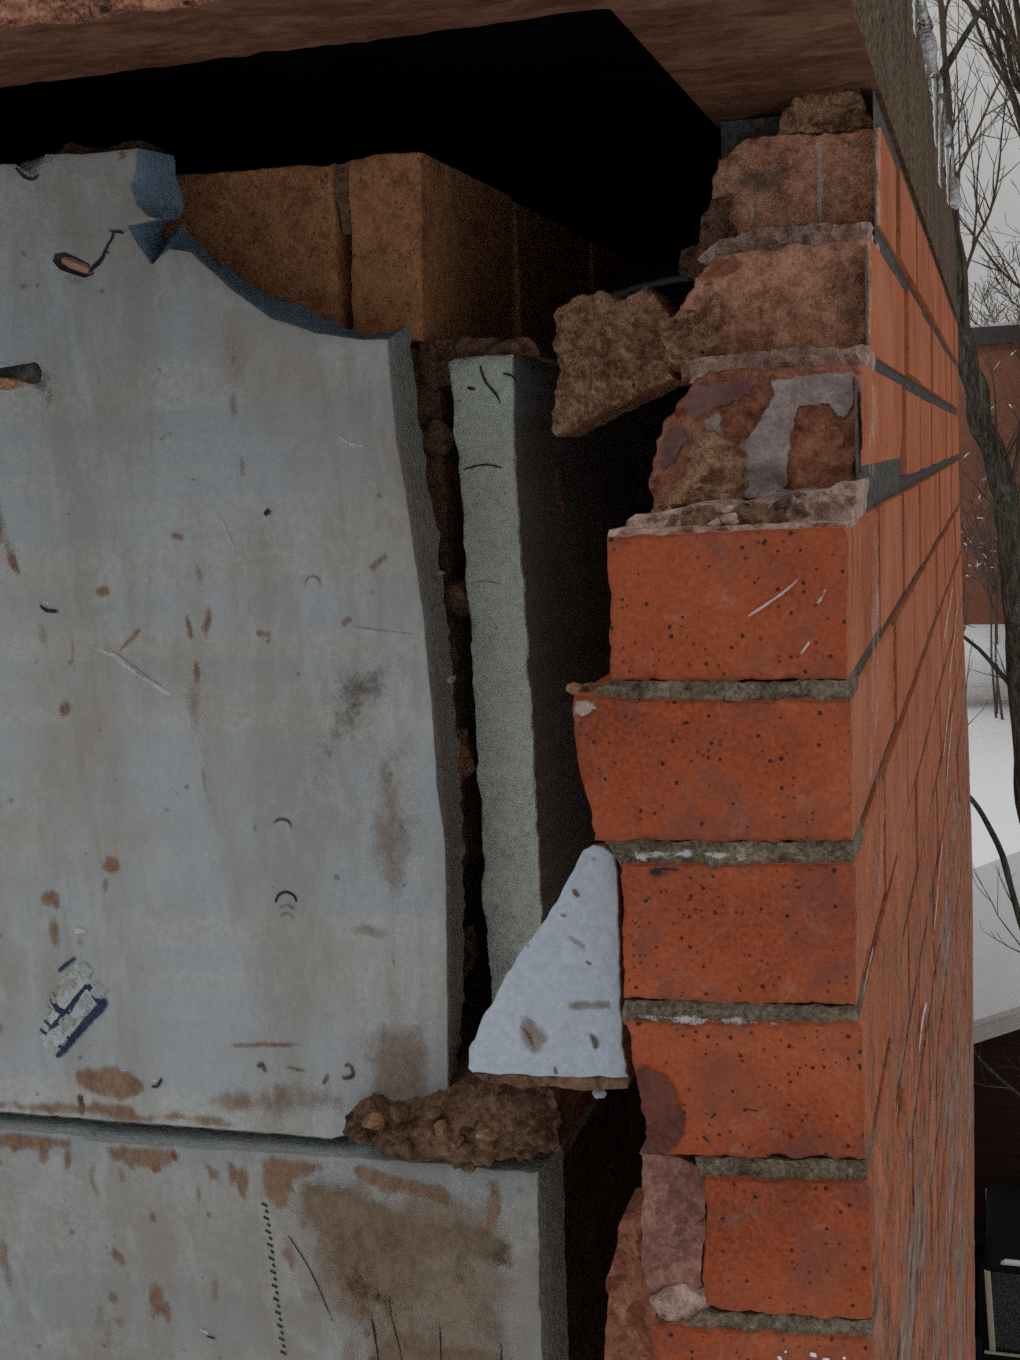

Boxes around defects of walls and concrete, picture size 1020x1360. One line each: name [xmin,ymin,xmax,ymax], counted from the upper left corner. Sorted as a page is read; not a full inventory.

spalling [61,256,93,274]
rust [104,858,118,888]
rust [42,891,58,941]
rust [0,1068,229,1126]
rust [0,1134,69,1168]
rust [110,1148,177,1172]
rust [207,1165,247,1195]
rust [263,1159,315,1208]
rust [355,1167,448,1204]
rust [150,1287,169,1320]